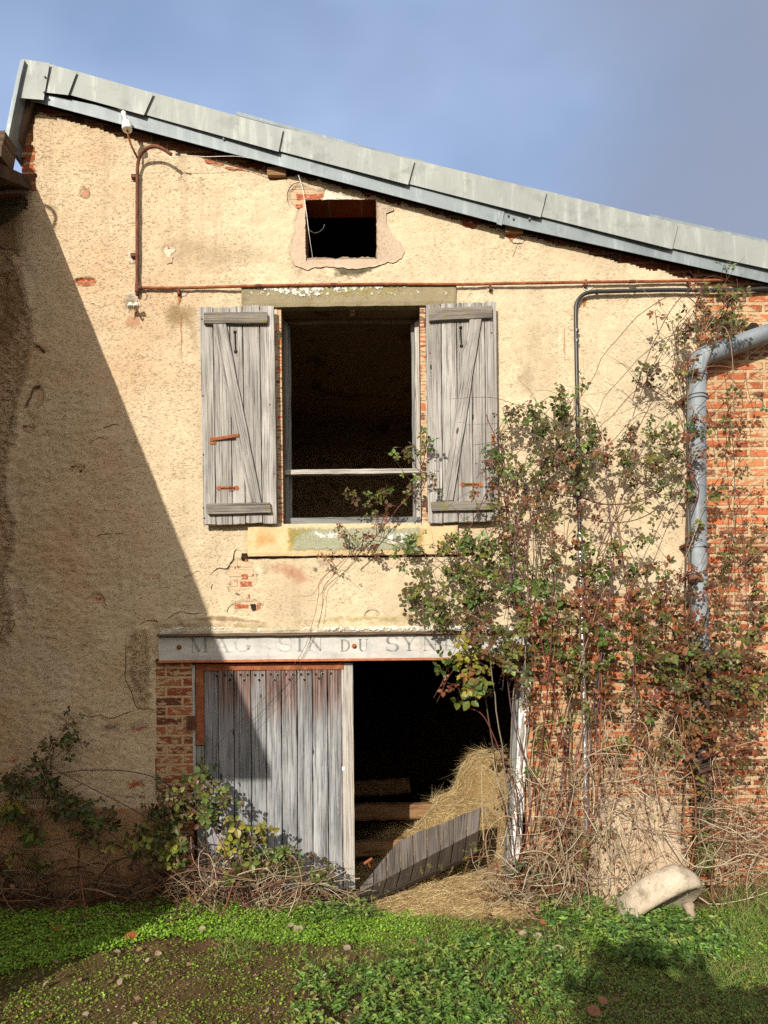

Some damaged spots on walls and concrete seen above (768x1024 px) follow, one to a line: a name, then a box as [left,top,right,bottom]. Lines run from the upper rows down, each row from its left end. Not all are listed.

peeling [248,185,419,297]
peeling [72,276,96,287]
crack [140,549,239,625]
spalling [227,553,263,612]